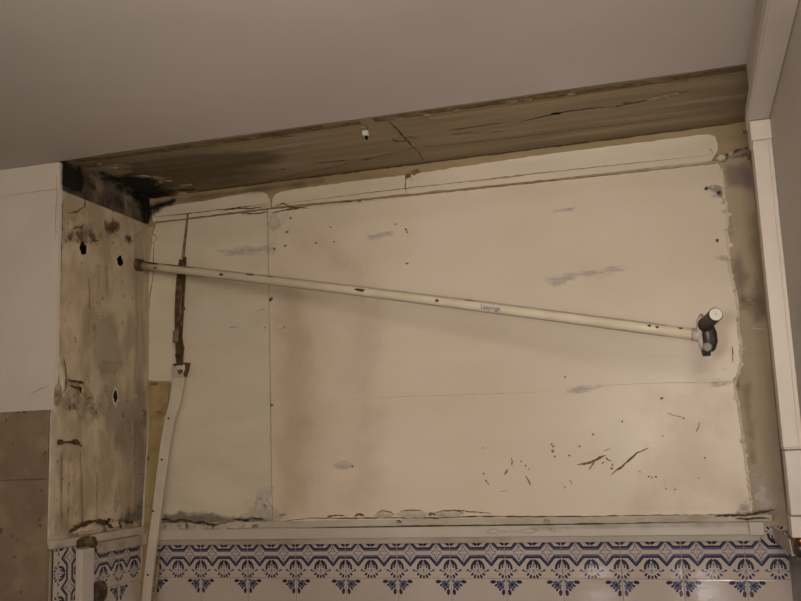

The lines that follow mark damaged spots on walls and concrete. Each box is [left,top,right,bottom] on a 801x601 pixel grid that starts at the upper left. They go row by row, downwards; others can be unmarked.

leakage [98,172,175,219]
crack [149,75,739,310]
leakage [105,219,119,233]
flaking render [54,354,94,410]
flaking render [160,517,268,530]